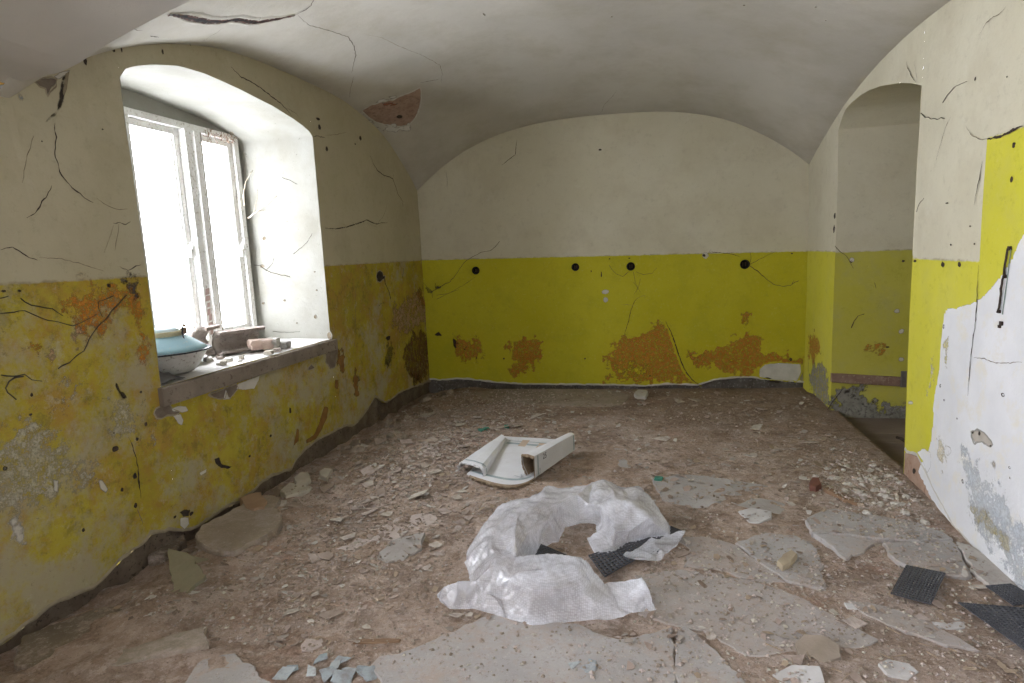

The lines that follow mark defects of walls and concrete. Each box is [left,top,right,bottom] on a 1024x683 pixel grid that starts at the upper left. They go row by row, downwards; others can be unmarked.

crack [135,0,443,86]
crack [233,69,295,113]
flaking render [361,87,422,133]
crack [936,122,1022,159]
crack [1,125,140,271]
peeling [61,273,151,366]
crack [665,321,701,386]
flaking render [828,384,913,419]
flaking render [904,234,1024,590]
flaking render [0,312,821,654]